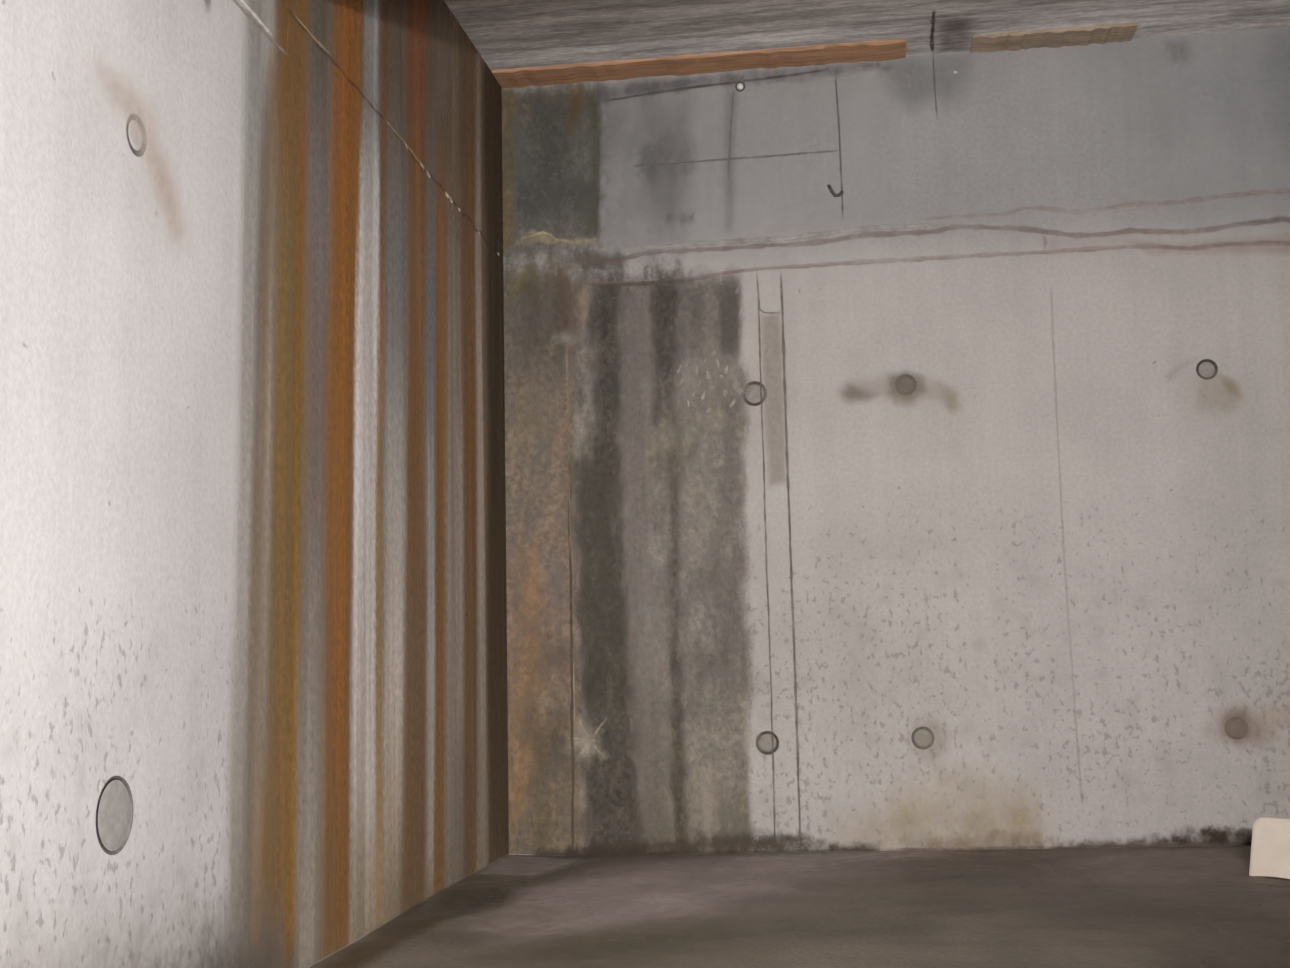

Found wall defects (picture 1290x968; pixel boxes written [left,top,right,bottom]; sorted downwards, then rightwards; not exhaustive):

corrosion [245,0,588,968]
water stain [502,84,877,857]